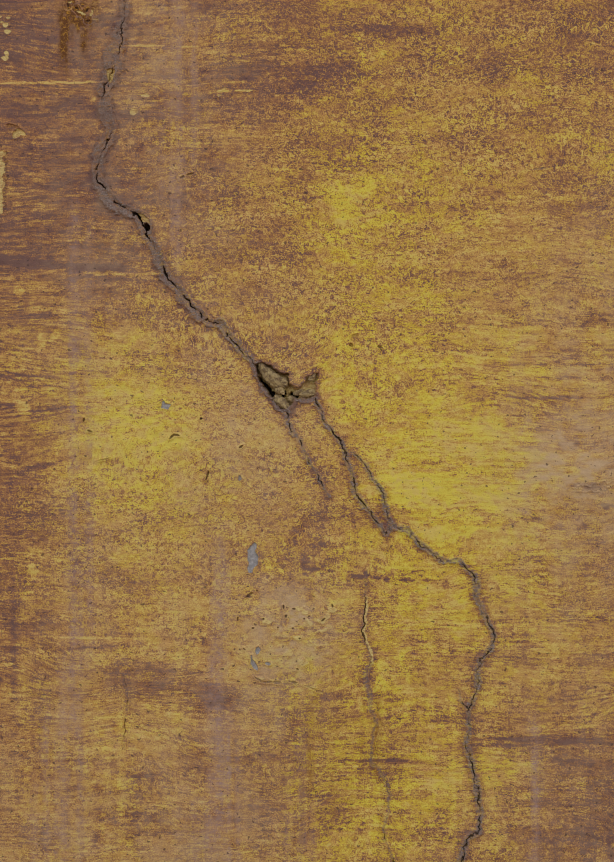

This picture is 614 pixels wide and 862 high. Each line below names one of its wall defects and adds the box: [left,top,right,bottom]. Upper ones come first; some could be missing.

spalling [0,122,29,234]
crack [88,0,501,862]
peeling [245,540,261,576]